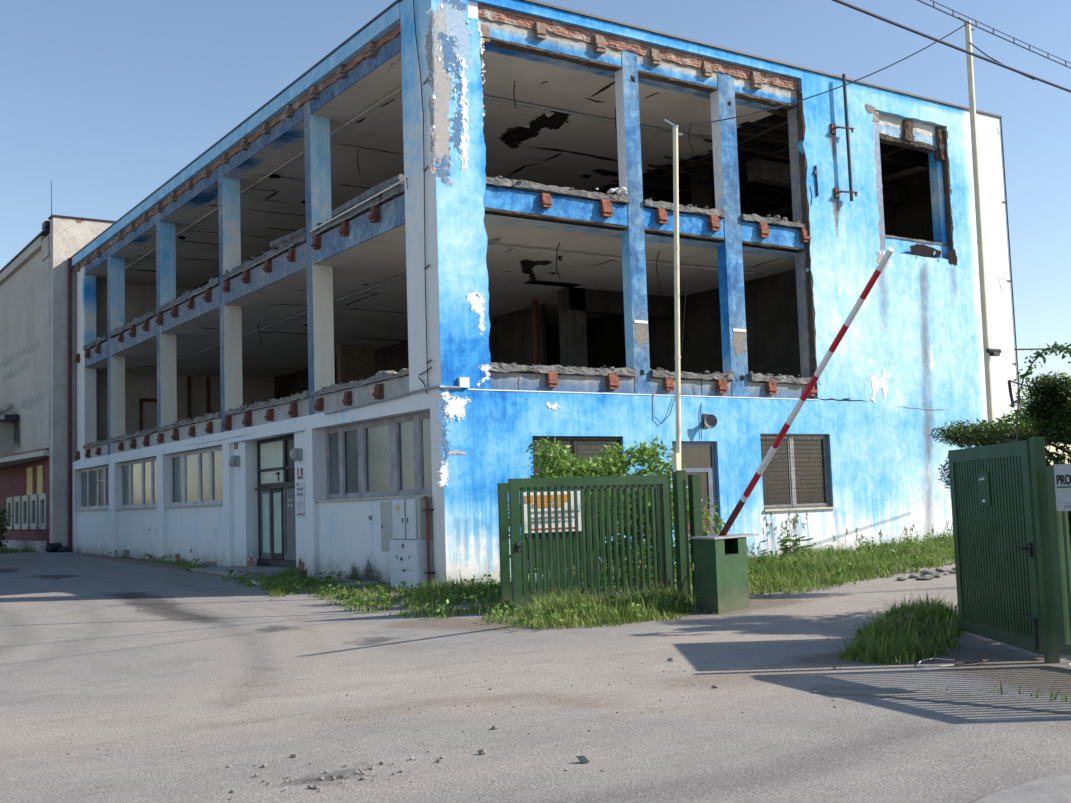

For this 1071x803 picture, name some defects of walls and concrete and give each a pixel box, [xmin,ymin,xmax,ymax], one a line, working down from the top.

peeling [425,0,718,186]
spalling [519,256,564,281]
peeling [465,291,486,335]
spalling [733,328,747,356]
spalling [477,362,820,387]
peeling [869,368,889,403]
peeling [437,388,472,487]